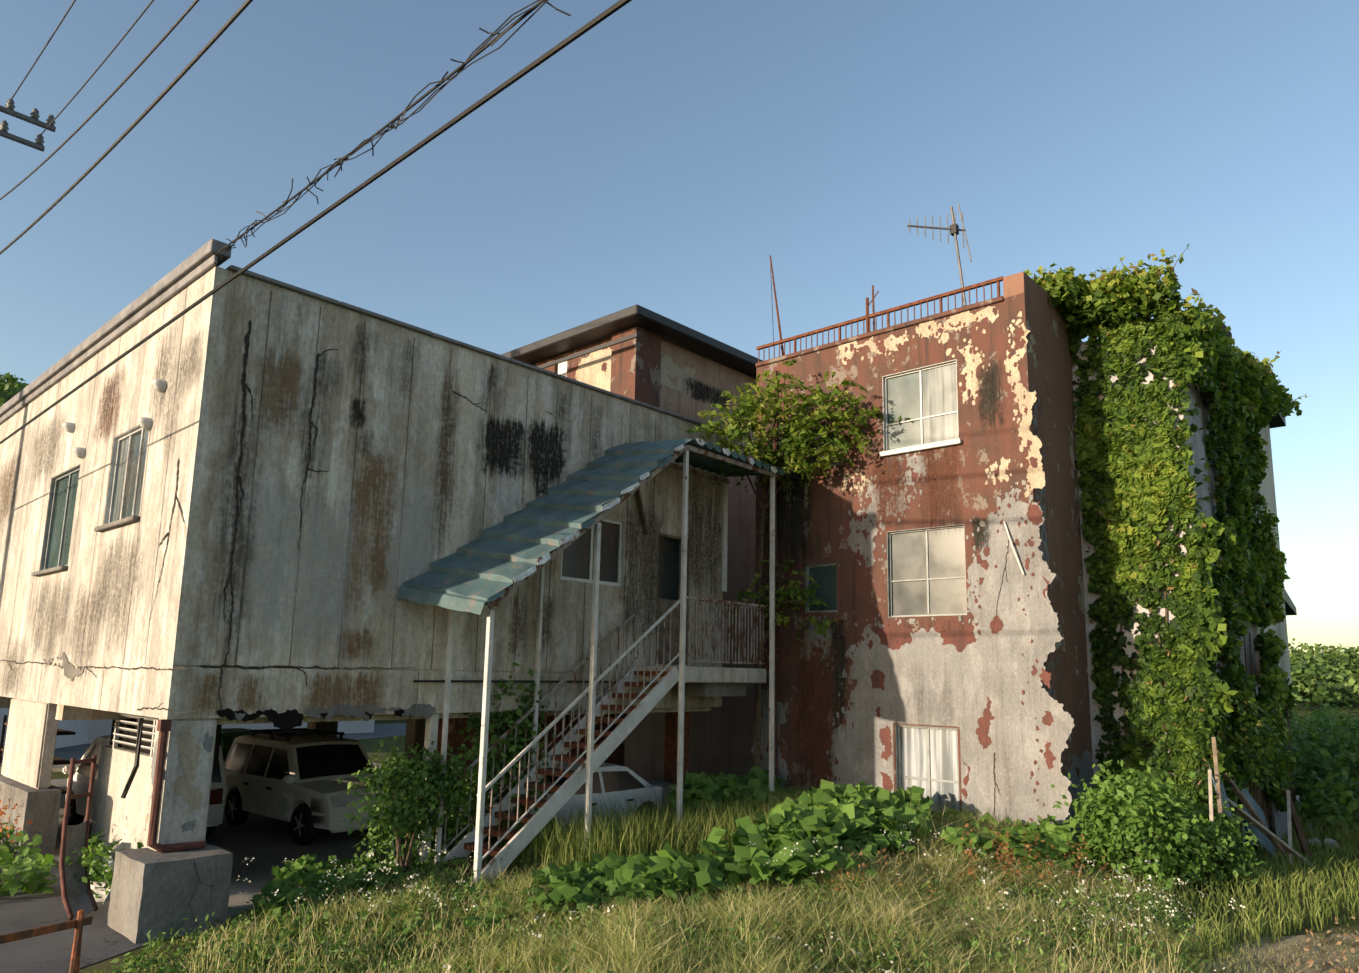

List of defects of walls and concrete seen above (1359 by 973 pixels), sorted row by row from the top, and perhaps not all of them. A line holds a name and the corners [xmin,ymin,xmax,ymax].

mould [481,416,566,498]
crack [0,319,414,714]
corrosion [347,455,393,598]
peeling [806,306,1095,848]
spalling [216,703,436,733]
peeling [145,735,159,824]
peeling [171,726,214,833]